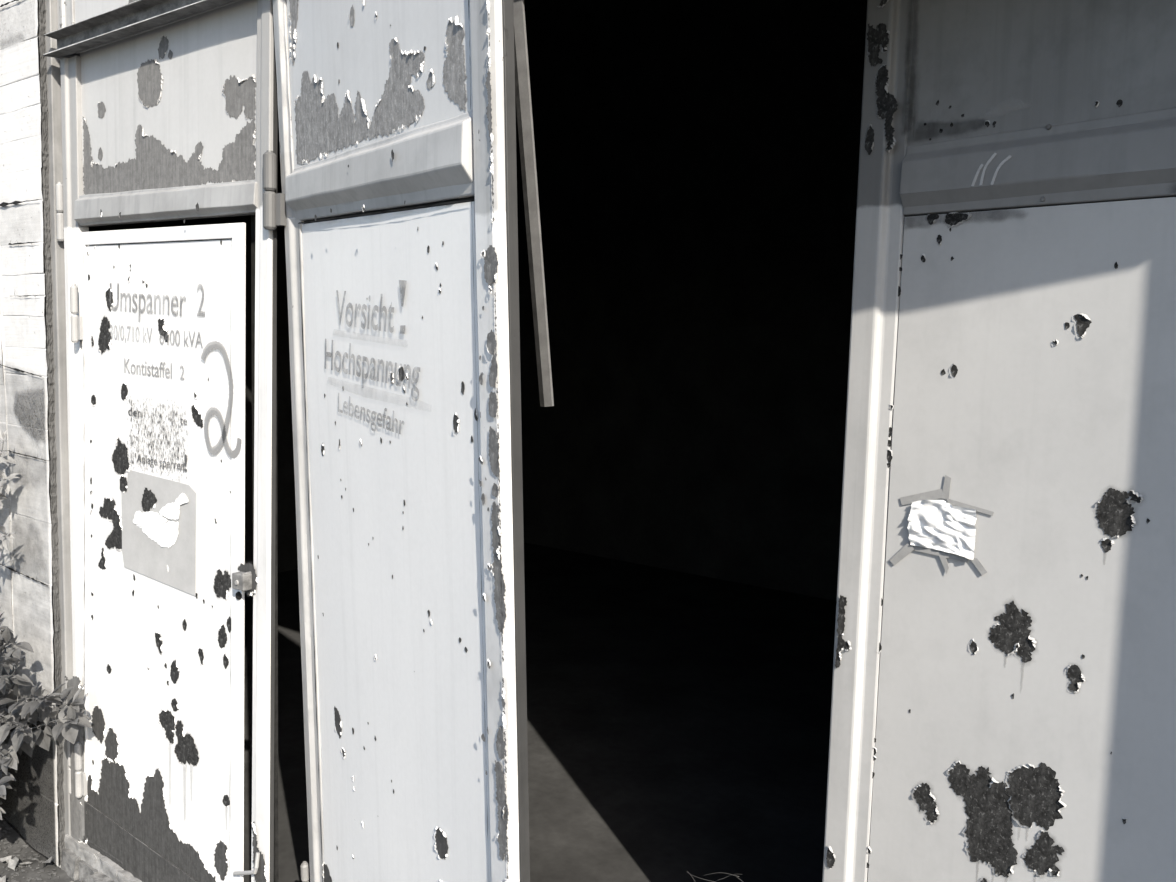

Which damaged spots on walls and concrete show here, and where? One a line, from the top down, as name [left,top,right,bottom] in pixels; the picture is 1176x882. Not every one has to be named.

peeling [82,74,256,195]
peeling [288,0,467,166]
peeling [485,0,494,224]
rust [864,22,898,155]
peeling [14,0,228,882]